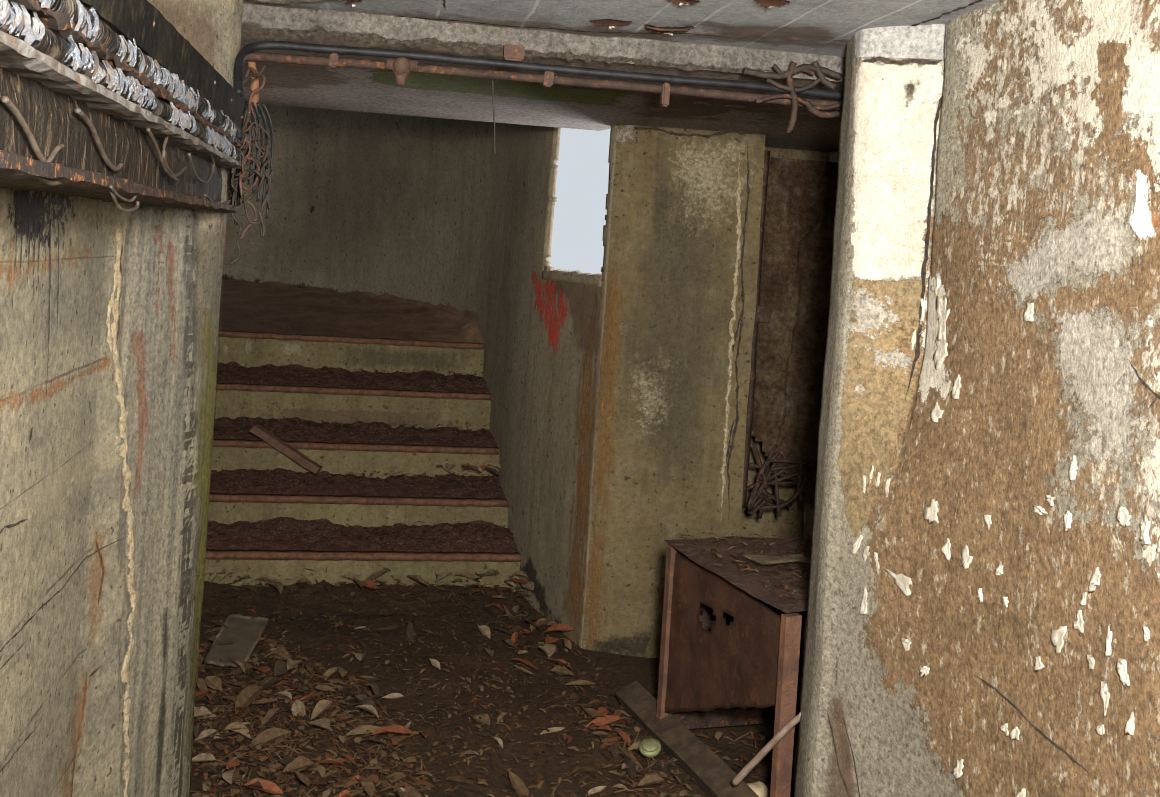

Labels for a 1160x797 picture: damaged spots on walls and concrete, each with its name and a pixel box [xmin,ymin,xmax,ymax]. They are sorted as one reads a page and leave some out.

crack [620,127,750,520]
crack [905,95,943,399]
flaking render [837,0,1160,797]
crack [1128,359,1160,409]
crack [974,674,1090,774]